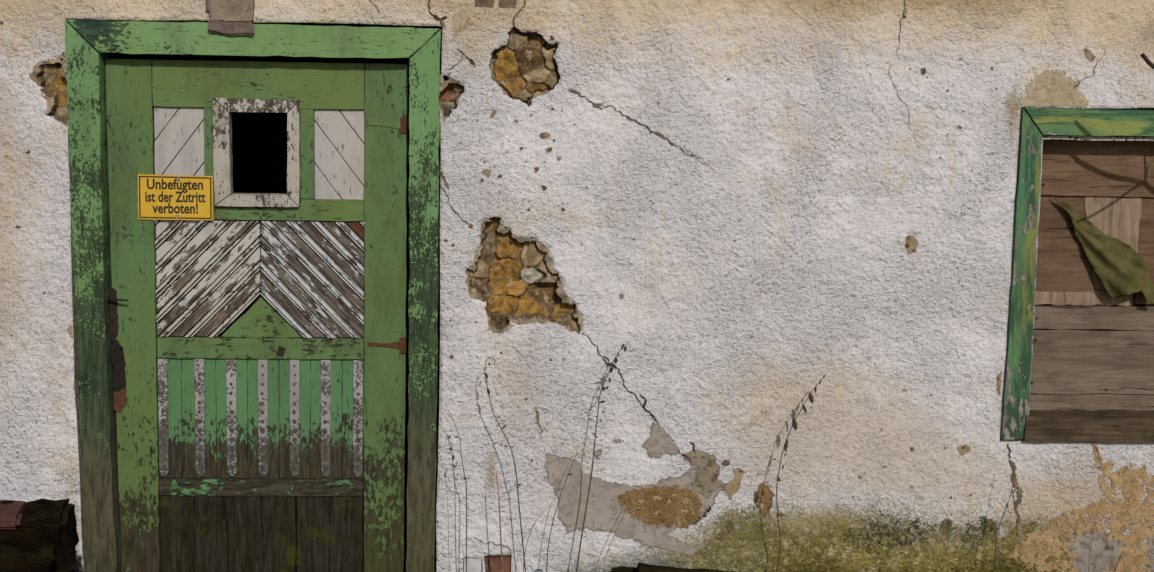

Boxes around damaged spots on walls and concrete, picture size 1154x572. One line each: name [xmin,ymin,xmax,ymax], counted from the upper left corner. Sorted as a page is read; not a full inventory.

spalling [29,51,68,127]
spalling [439,74,465,123]
spalling [489,27,560,123]
spalling [509,132,561,173]
crack [569,88,715,173]
spalling [464,217,583,334]
crack [582,333,659,425]
flaking render [530,422,745,556]
leakage [705,506,862,572]
leakage [829,511,1061,572]
crack [1007,443,1023,528]
flaking render [1009,442,1154,572]